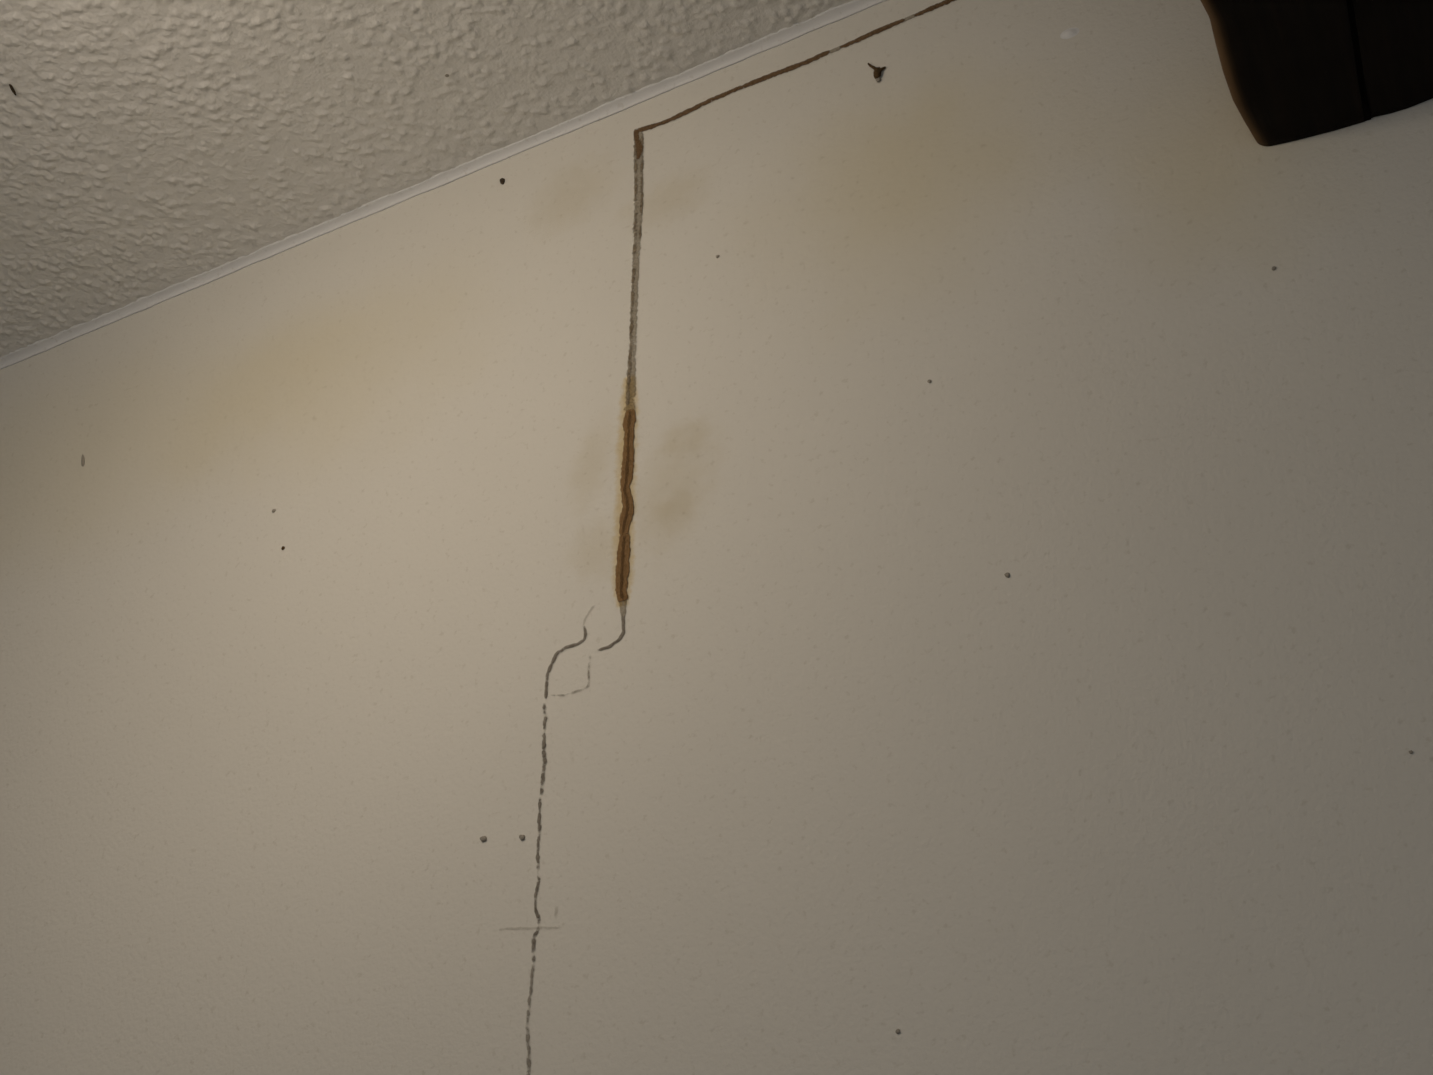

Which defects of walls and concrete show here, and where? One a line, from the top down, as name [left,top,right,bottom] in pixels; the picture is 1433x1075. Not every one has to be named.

crack [624,0,955,411]
corrosion [615,409,636,602]
crack [526,600,627,1075]